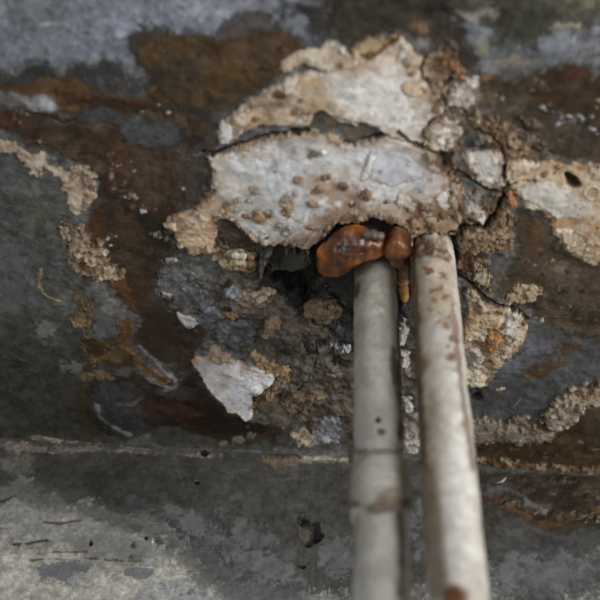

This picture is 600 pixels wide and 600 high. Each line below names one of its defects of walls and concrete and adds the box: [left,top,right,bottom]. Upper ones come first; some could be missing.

crack [202,127,311,158]
crack [344,93,557,245]
peeling [58,224,115,283]
flaking render [163,33,600,450]
water stain [155,258,214,332]
water stain [223,285,242,300]
corrosion [391,312,404,450]